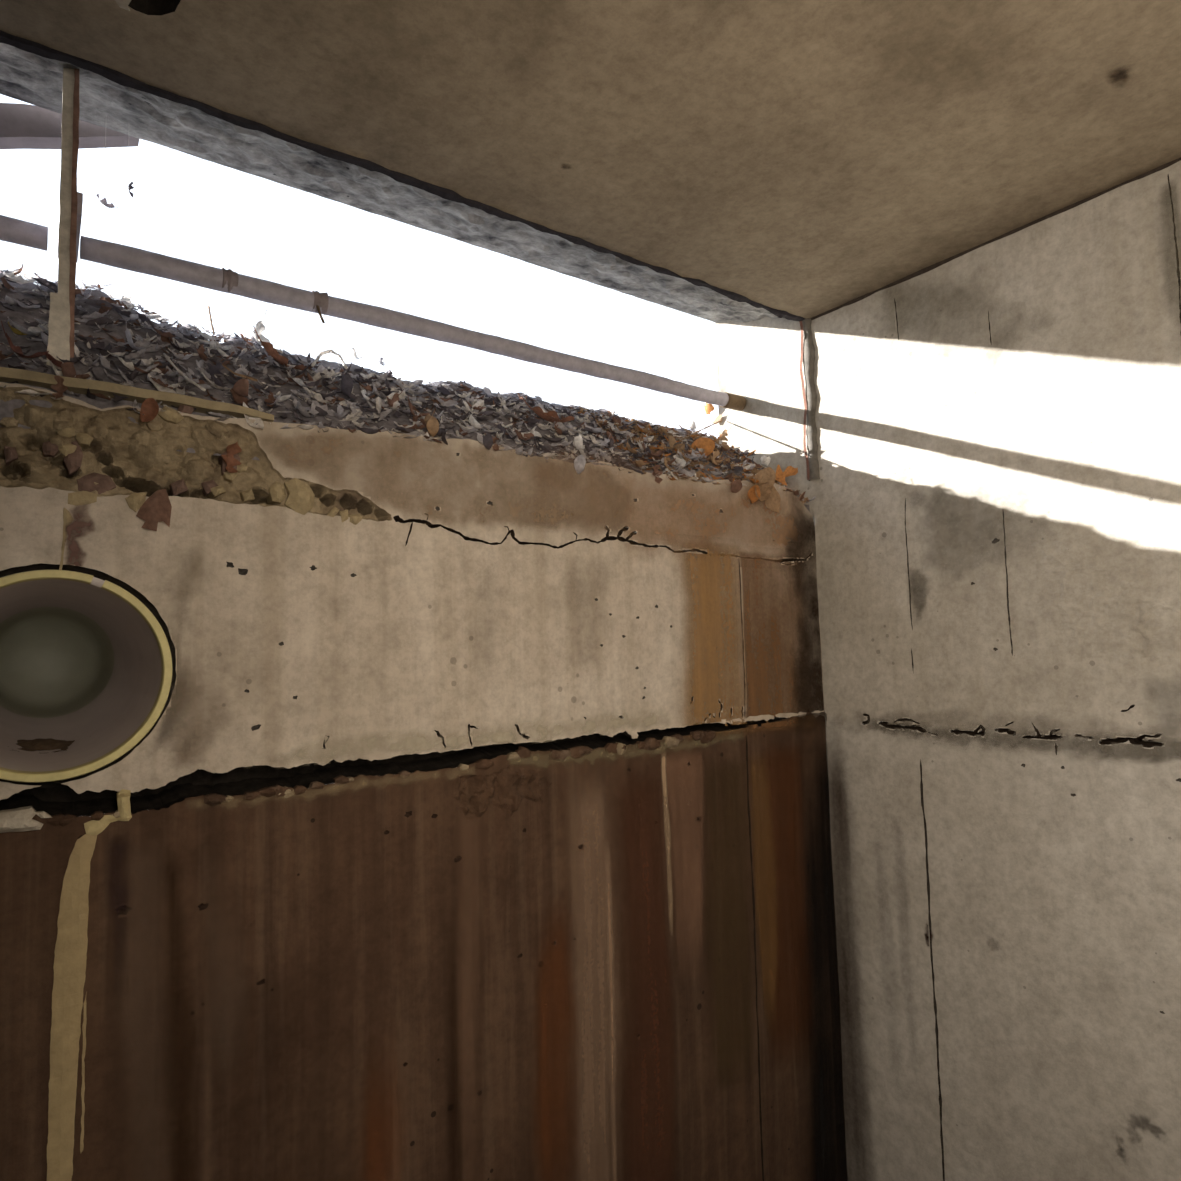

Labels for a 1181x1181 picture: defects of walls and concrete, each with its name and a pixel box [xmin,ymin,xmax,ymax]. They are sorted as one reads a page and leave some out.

peeling [115,0,131,11]
crack [1167,175,1181,333]
spalling [0,387,392,570]
rust [685,545,815,731]
crack [771,553,812,565]
crack [905,498,914,674]
crack [1003,511,1013,656]
crack [0,513,786,1181]
crack [862,705,1164,1181]